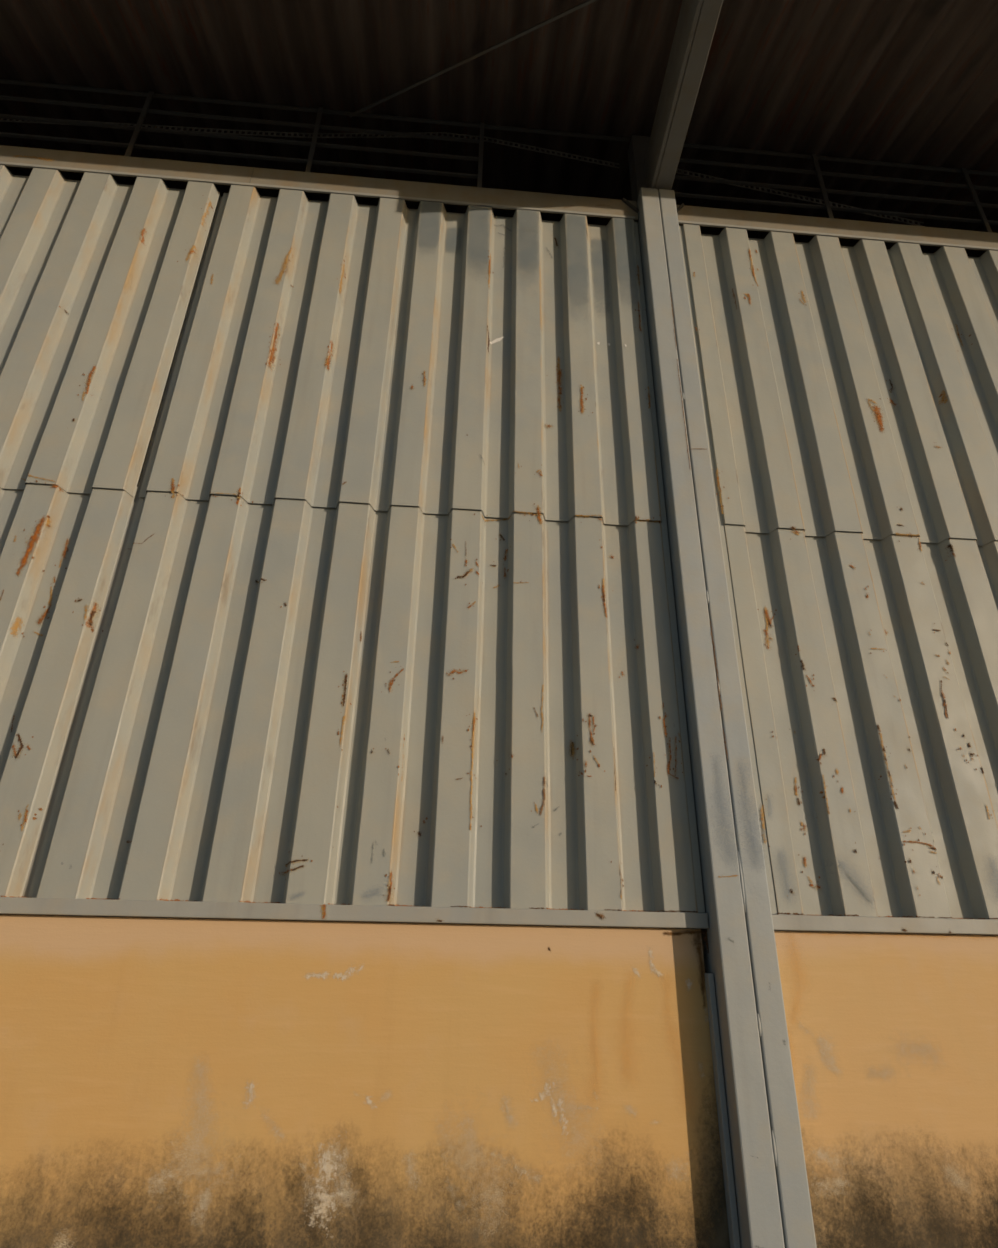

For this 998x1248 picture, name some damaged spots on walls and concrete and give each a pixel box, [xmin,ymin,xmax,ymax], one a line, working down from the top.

corrosion [265,323,281,372]
corrosion [866,378,896,431]
corrosion [14,515,50,576]
corrosion [10,538,70,637]
corrosion [73,598,103,632]
corrosion [757,608,777,651]
corrosion [569,714,616,784]
corrosion [647,703,683,787]
corrosion [903,826,943,895]
water stain [0,971,730,1248]
water stain [808,1140,998,1248]